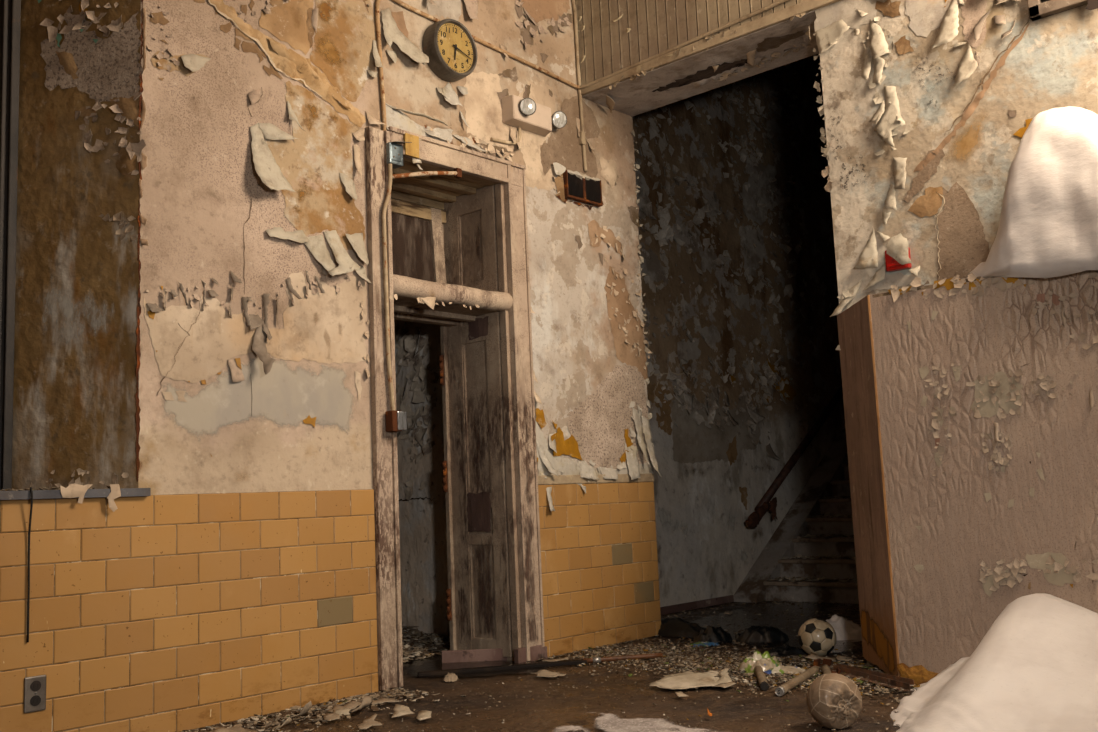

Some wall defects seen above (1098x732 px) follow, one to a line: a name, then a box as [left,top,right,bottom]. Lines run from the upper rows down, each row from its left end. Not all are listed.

peeling [39,0,211,179]
crack [157,312,200,395]
peeling [143,0,1098,641]